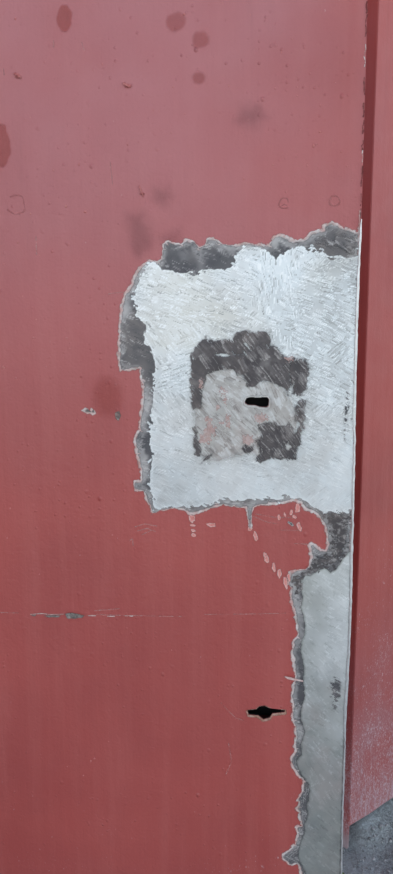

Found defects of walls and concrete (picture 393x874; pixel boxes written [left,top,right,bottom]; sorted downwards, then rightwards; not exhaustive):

peeling [116,1,368,874]